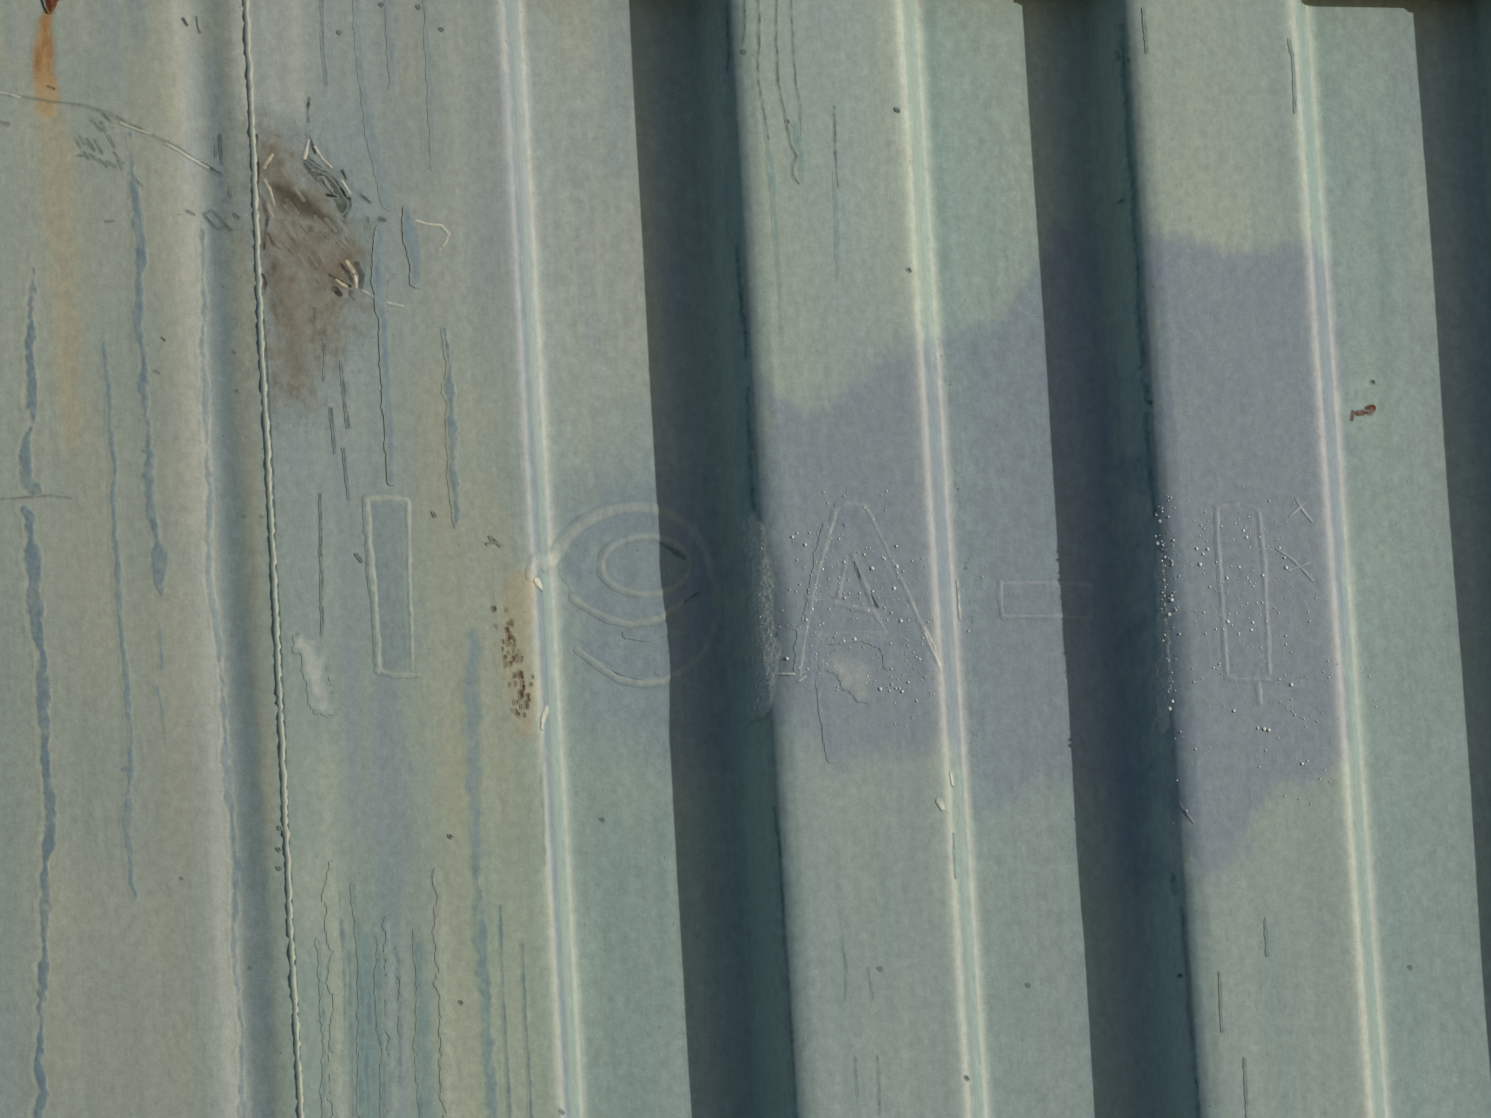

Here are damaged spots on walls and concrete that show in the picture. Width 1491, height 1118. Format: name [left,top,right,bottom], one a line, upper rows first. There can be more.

rust [492,563,545,745]